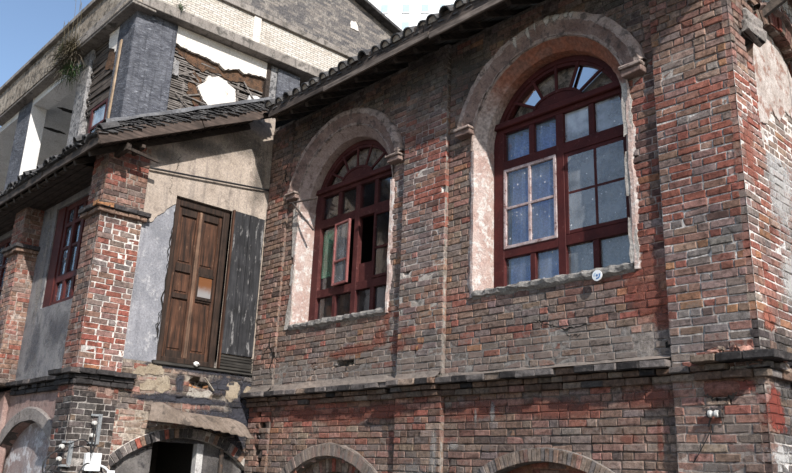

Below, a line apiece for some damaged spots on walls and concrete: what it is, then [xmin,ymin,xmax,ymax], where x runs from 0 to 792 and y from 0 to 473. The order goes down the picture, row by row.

peeling [172,26,268,107]
crack [532,320,591,337]
crack [262,330,278,379]
peeling [132,364,170,393]
peeling [187,384,212,398]
peeling [225,382,251,402]
water stain [773,446,790,473]